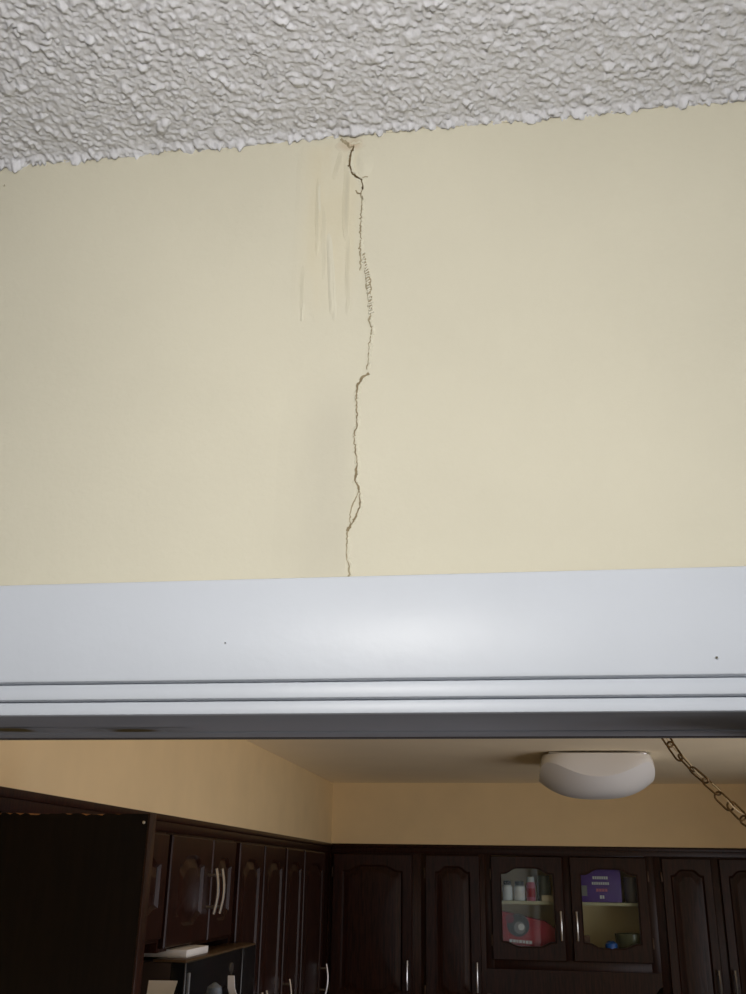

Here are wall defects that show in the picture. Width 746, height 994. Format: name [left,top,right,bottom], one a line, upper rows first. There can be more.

crack [340,138,375,577]